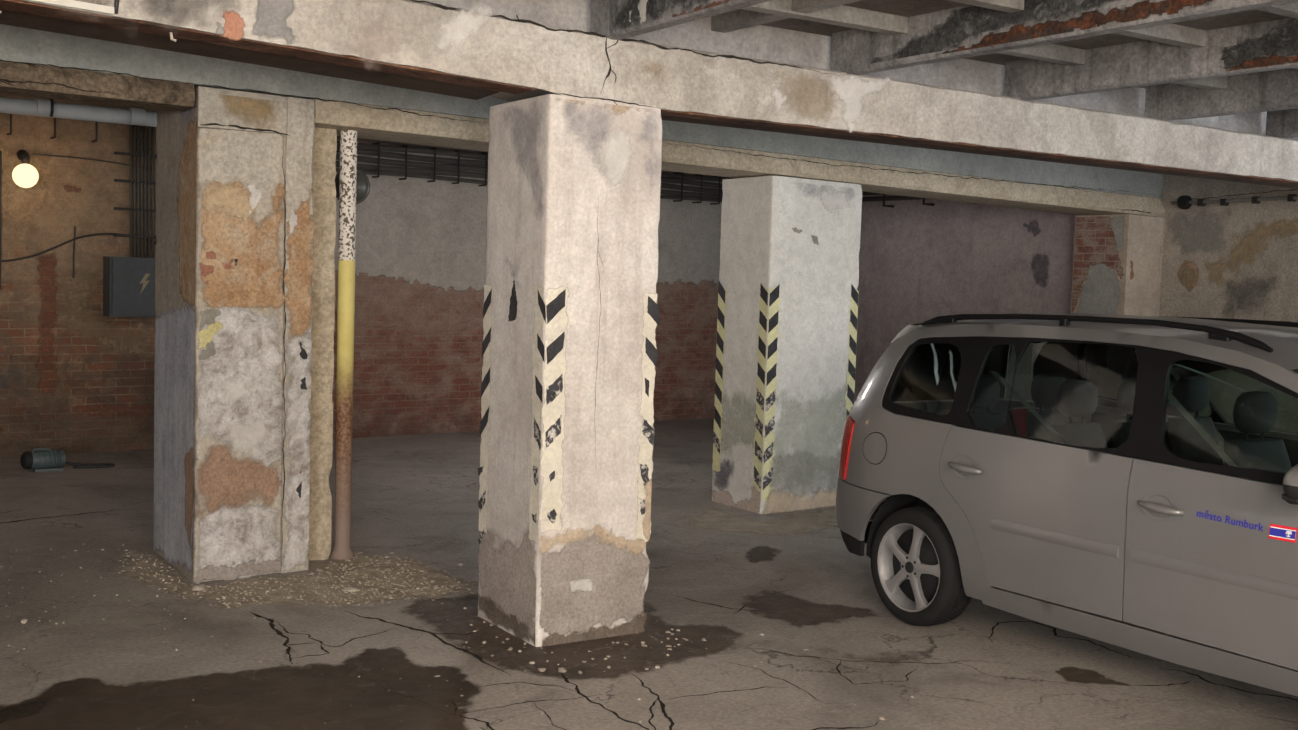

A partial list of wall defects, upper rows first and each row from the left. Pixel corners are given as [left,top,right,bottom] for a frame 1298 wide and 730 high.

crack [411,0,854,109]
corrosion [937,0,1212,55]
corrosion [1220,55,1298,71]
crack [671,144,1165,214]
spalling [1071,216,1134,314]
peeling [154,118,314,570]
spalling [478,479,652,645]
water stain [0,647,480,730]
water stain [405,595,742,680]
crack [250,611,1298,730]